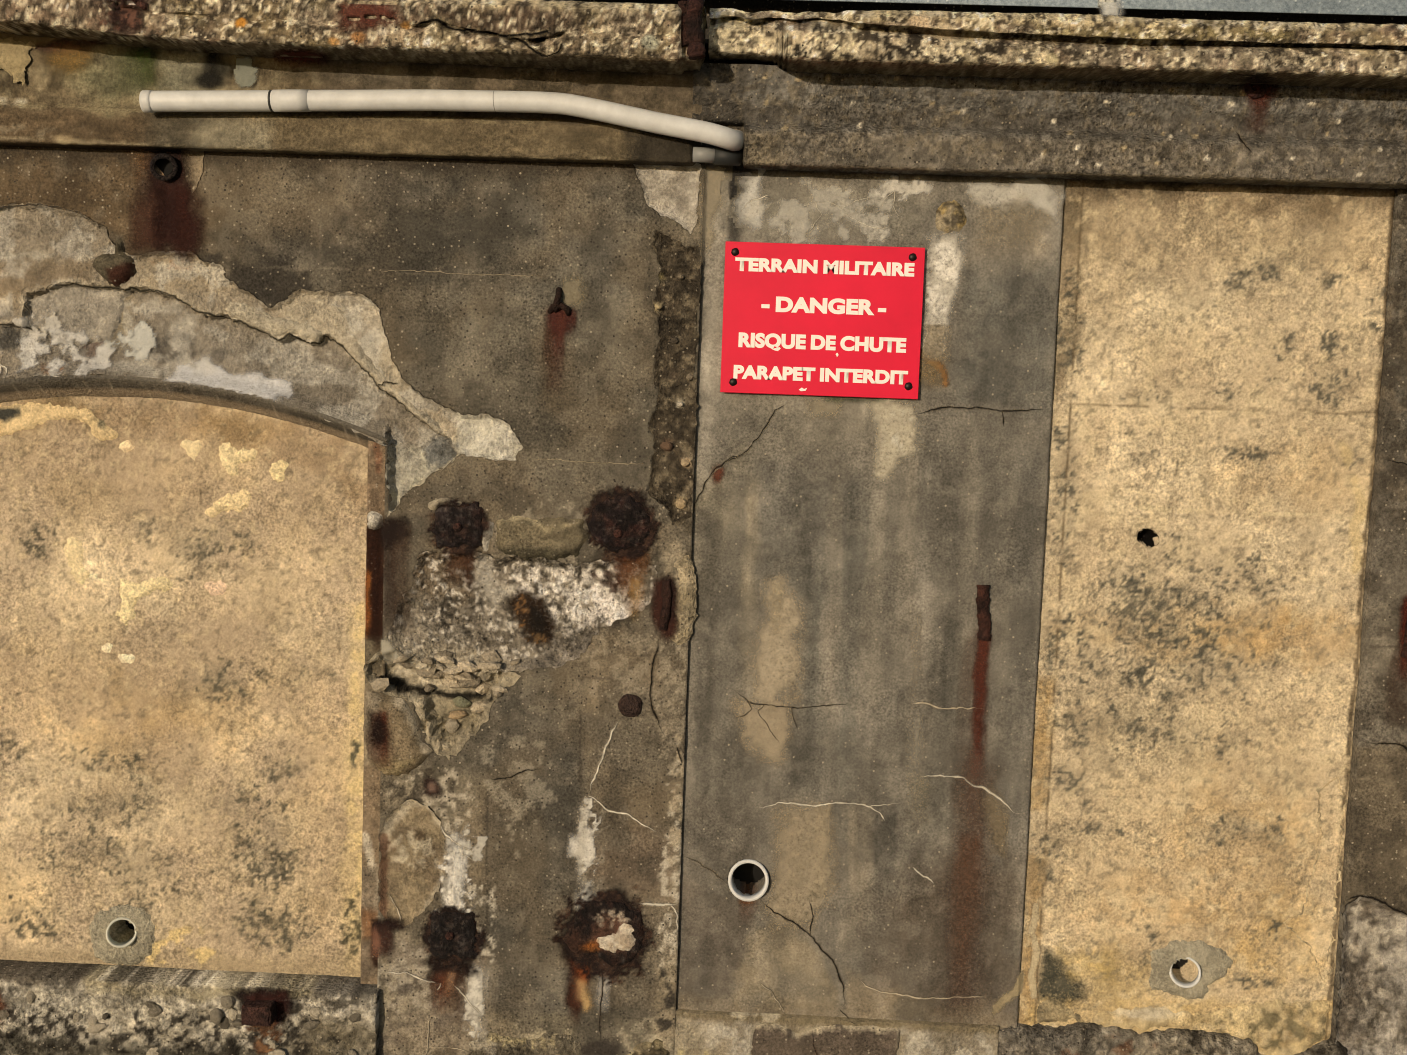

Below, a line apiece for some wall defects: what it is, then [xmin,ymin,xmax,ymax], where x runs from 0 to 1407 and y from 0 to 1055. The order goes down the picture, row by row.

spalling [0,203,523,518]
corrosion [365,499,490,644]
spalling [363,551,657,760]
corrosion [510,591,555,645]
corrosion [583,485,678,640]
spalling [671,555,698,645]
crack [589,722,656,832]
crack [760,802,895,819]
corrosion [943,585,993,1012]
crack [919,775,1018,814]
crack [767,904,982,1024]
spalling [1037,777,1407,1055]